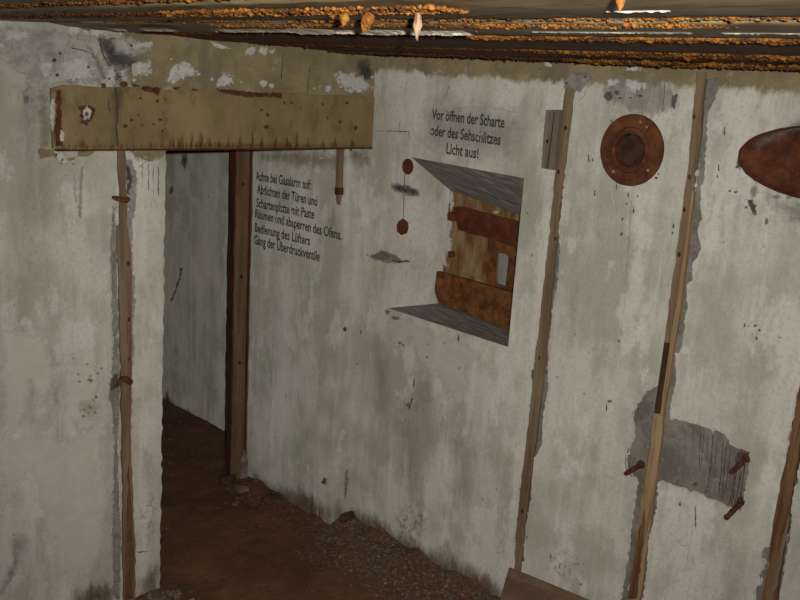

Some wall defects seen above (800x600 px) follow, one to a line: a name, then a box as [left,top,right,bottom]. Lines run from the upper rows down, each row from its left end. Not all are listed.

peeling [166,58,200,84]
peeling [313,72,374,94]
corrosion [0,0,800,73]
peeling [604,66,677,116]
spalling [652,78,750,526]
spalling [621,386,658,600]